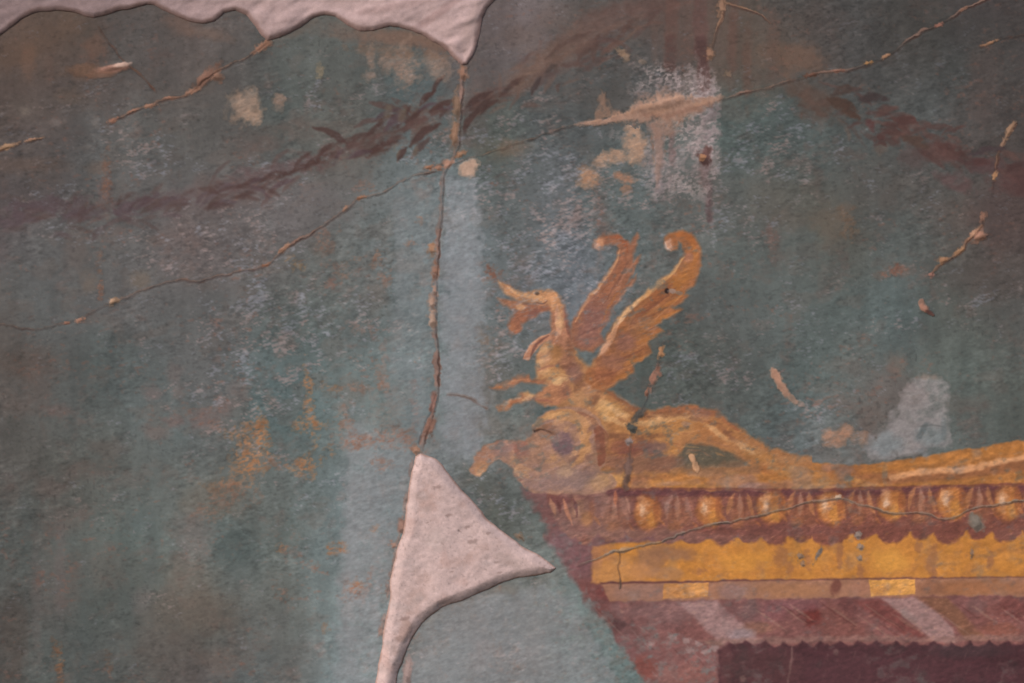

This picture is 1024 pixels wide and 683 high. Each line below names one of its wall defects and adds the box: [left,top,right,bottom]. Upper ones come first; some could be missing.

crack [97,26,274,126]
crack [703,0,772,63]
crack [722,0,990,102]
flaking render [574,122,651,199]
crack [927,119,1018,279]
crack [0,64,594,456]
crack [621,338,667,493]
peeling [377,454,415,638]
crack [575,493,1024,591]
peeling [401,652,415,683]